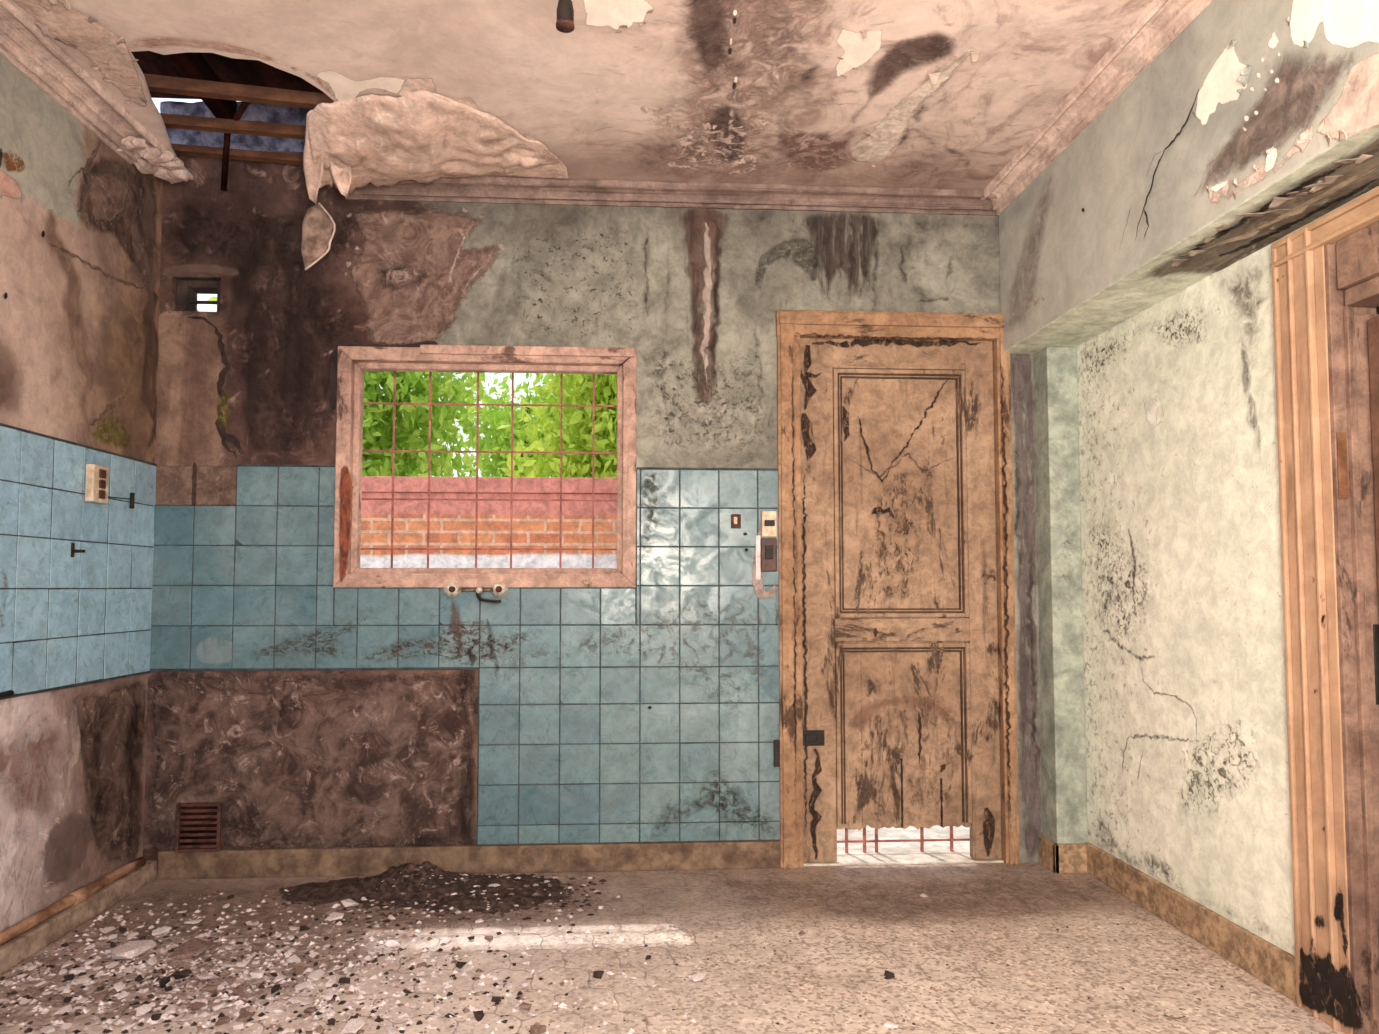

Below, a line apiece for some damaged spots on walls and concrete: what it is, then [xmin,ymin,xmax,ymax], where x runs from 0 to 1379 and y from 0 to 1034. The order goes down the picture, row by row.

peeling [583,0,655,33]
leakage [641,0,847,177]
peeling [836,29,882,79]
leakage [871,34,951,96]
crack [1122,89,1199,239]
peeling [1150,0,1379,277]
leakage [178,205,351,448]
leakage [756,214,879,295]
flaking render [148,673,478,853]
leakage [1182,723,1251,809]